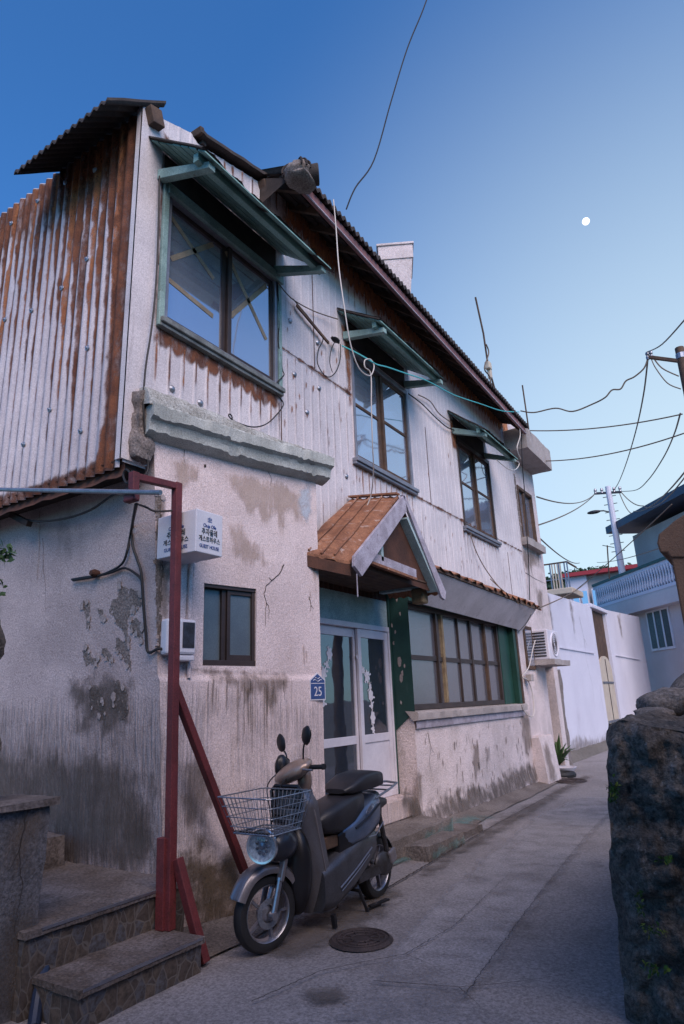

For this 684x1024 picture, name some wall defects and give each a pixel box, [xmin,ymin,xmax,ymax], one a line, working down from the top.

rust [0,113,138,507]
rust [155,325,355,436]
spalling [80,495,166,672]
crack [264,564,284,623]
water stain [73,681,127,735]
spalling [88,680,129,723]
water stain [0,750,151,870]
water stain [403,715,538,818]